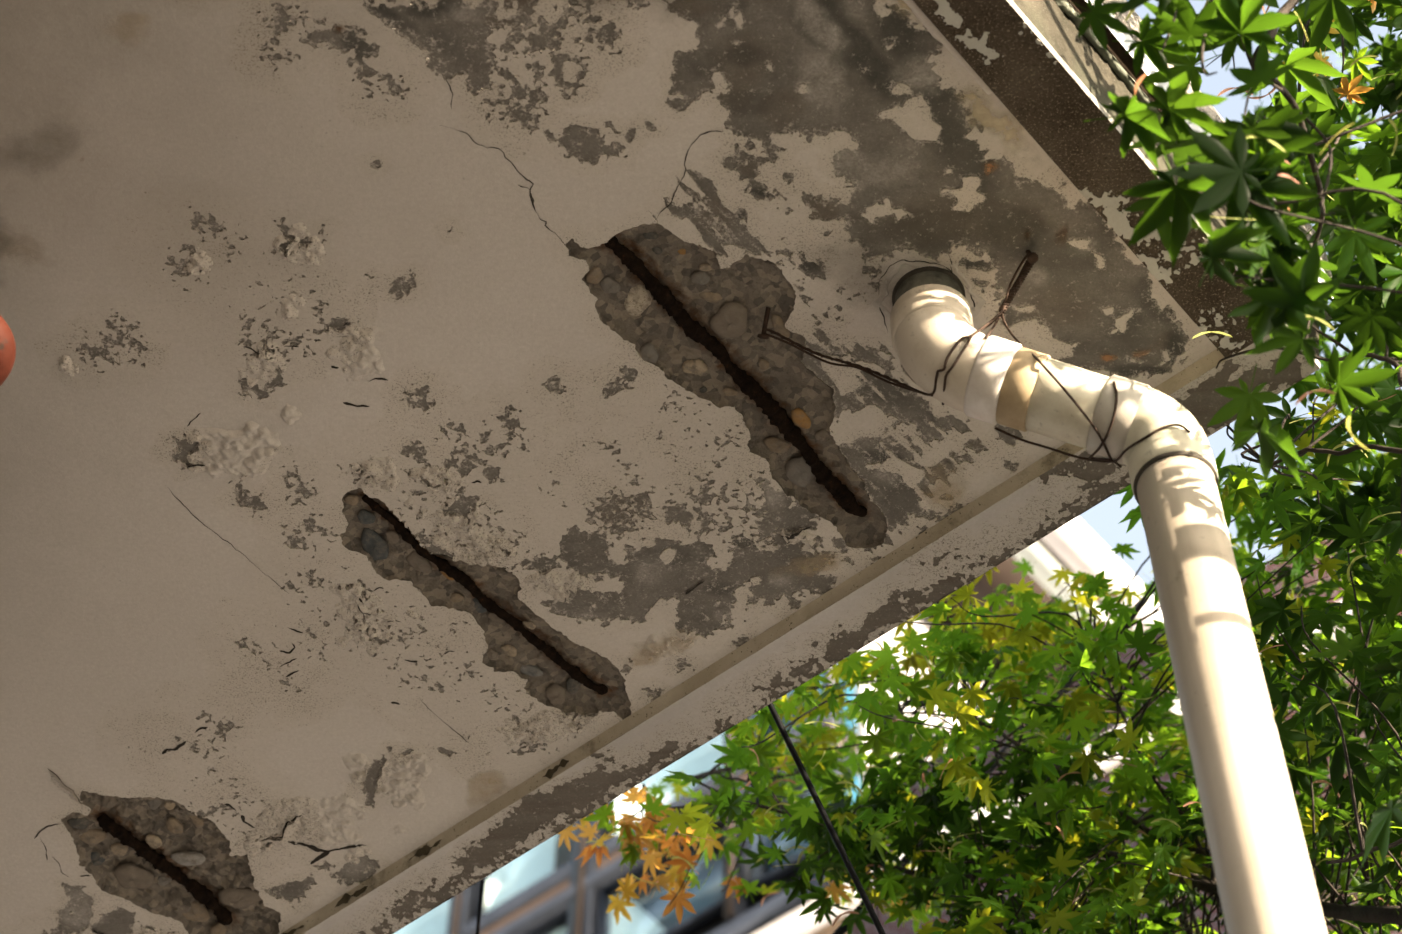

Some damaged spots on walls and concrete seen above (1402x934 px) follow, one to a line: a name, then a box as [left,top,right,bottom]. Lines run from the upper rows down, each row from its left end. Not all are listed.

crack [446,79,565,245]
crack [656,131,724,219]
peeling [76,312,148,372]
peeling [229,275,359,399]
spalling [257,0,1305,754]
peeling [228,480,268,517]
peeling [236,637,301,691]
peeling [351,451,1130,934]
spalling [41,710,380,934]
crack [224,803,367,864]